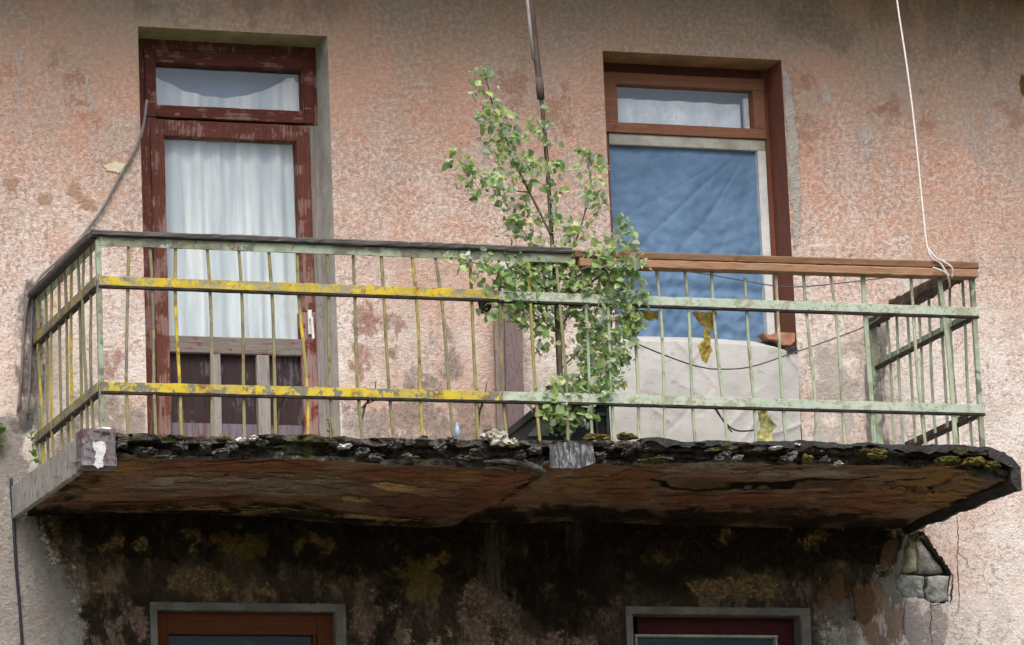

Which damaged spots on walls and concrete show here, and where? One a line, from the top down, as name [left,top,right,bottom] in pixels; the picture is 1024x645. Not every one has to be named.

flaking render [783,71,802,247]
spalling [92,427,270,469]
spalling [328,429,542,462]
spalling [594,441,674,461]
spalling [713,442,749,462]
spalling [768,443,802,464]
spalling [819,455,843,467]
crack [651,469,937,494]
leakage [31,513,925,645]
flaking render [881,531,951,645]
crack [903,518,969,641]